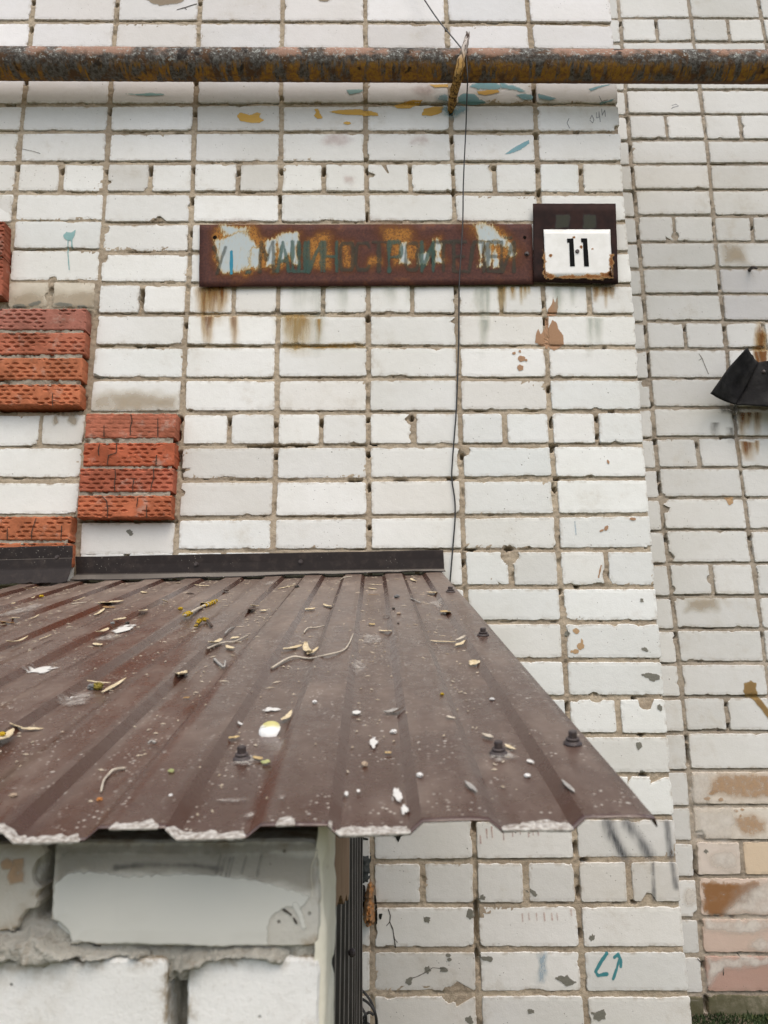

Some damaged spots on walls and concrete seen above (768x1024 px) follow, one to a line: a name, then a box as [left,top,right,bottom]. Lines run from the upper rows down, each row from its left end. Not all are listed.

rust [199,287,224,335]
rust [283,315,363,349]
peeling [1,859,23,884]